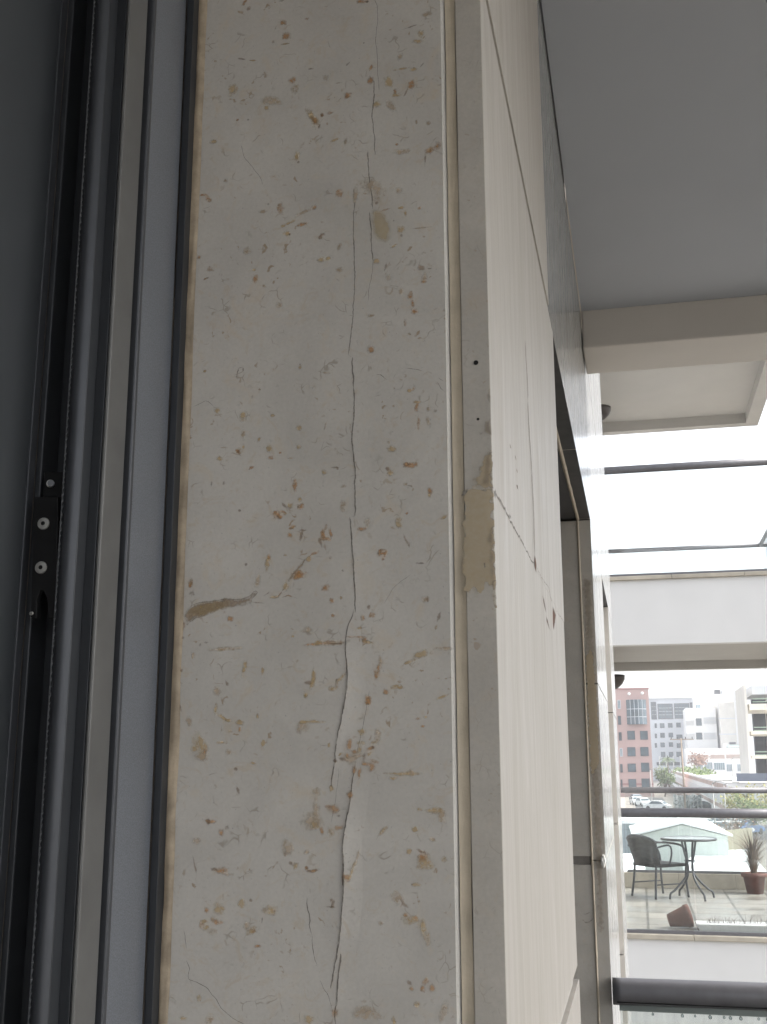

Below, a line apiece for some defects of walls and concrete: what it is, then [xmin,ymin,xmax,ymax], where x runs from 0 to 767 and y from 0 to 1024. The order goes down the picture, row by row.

crack [307,1,382,1024]
peeling [462,455,496,593]
crack [494,413,562,619]